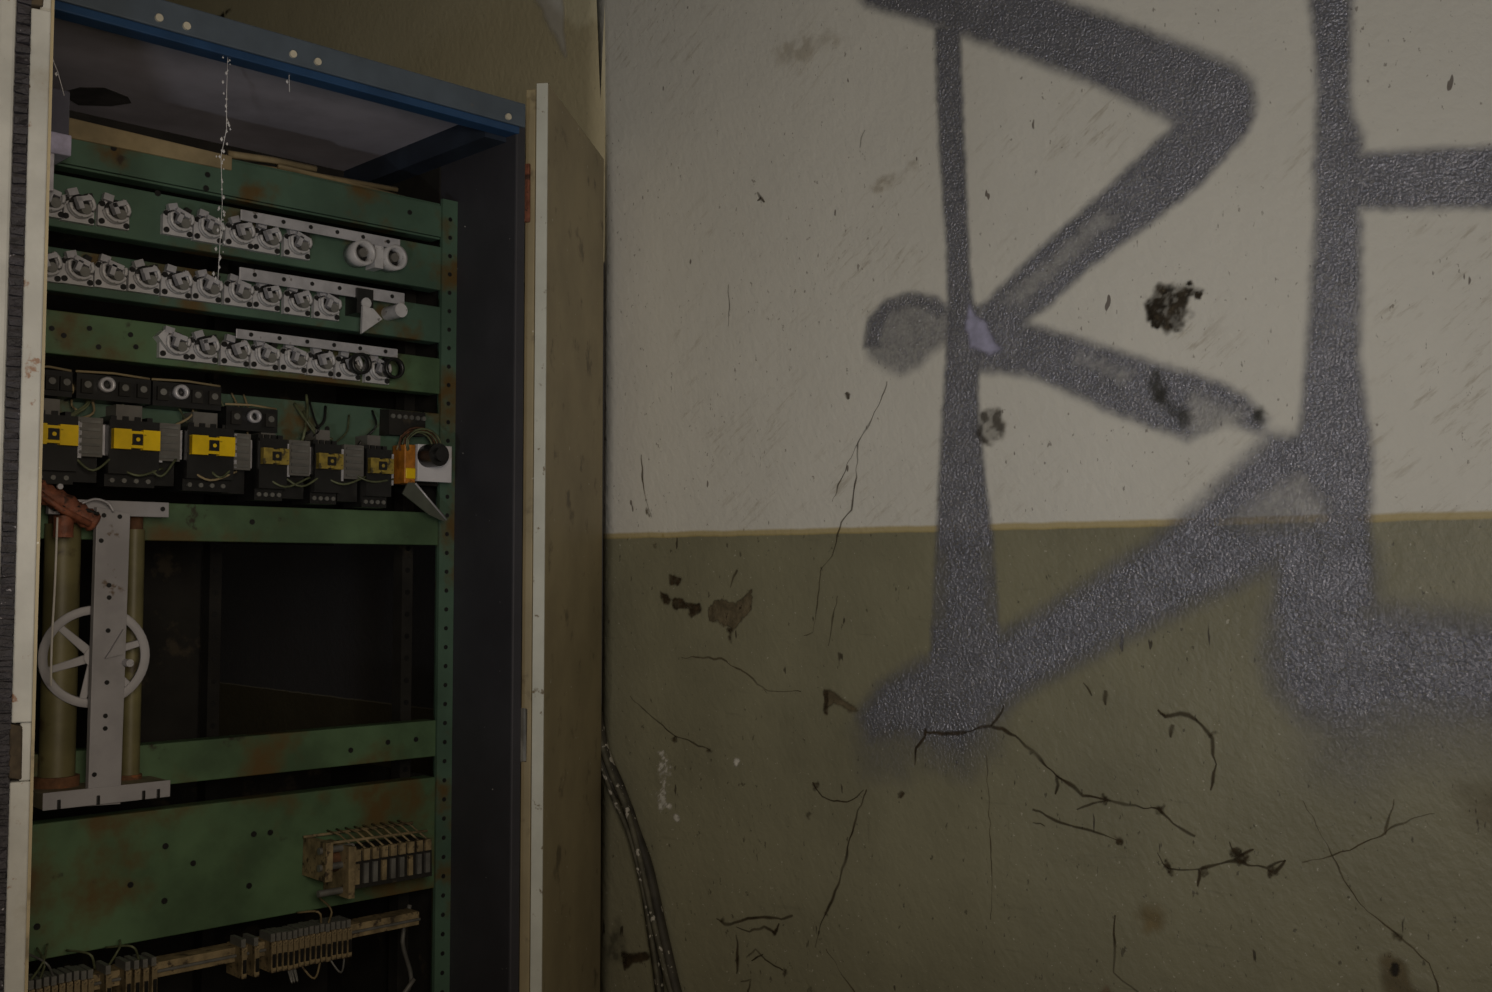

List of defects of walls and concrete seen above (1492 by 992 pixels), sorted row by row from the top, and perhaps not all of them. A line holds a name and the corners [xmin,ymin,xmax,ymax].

flaking render [1145,281,1202,332]
flaking render [977,411,1004,443]
crack [804,390,885,646]
peeling [661,575,752,639]
peeling [823,690,857,715]
crack [716,705,1286,992]
crack [1303,801,1439,992]